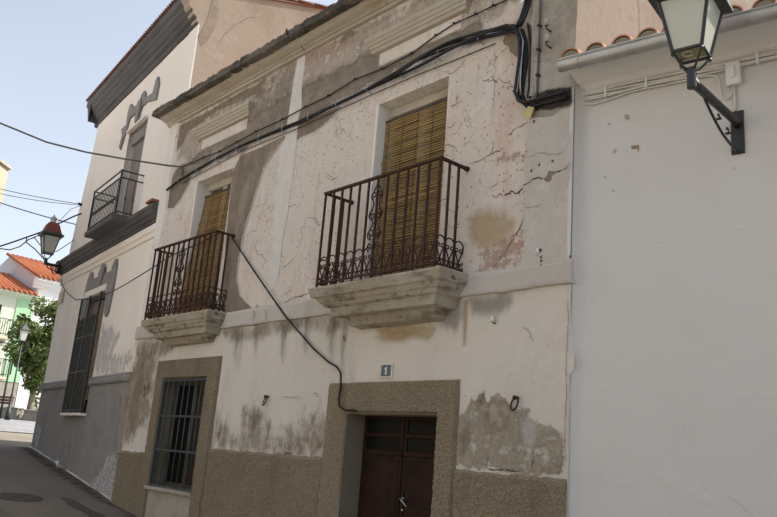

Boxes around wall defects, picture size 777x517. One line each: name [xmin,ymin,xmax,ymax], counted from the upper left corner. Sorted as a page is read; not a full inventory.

water stain [216,414,325,456]